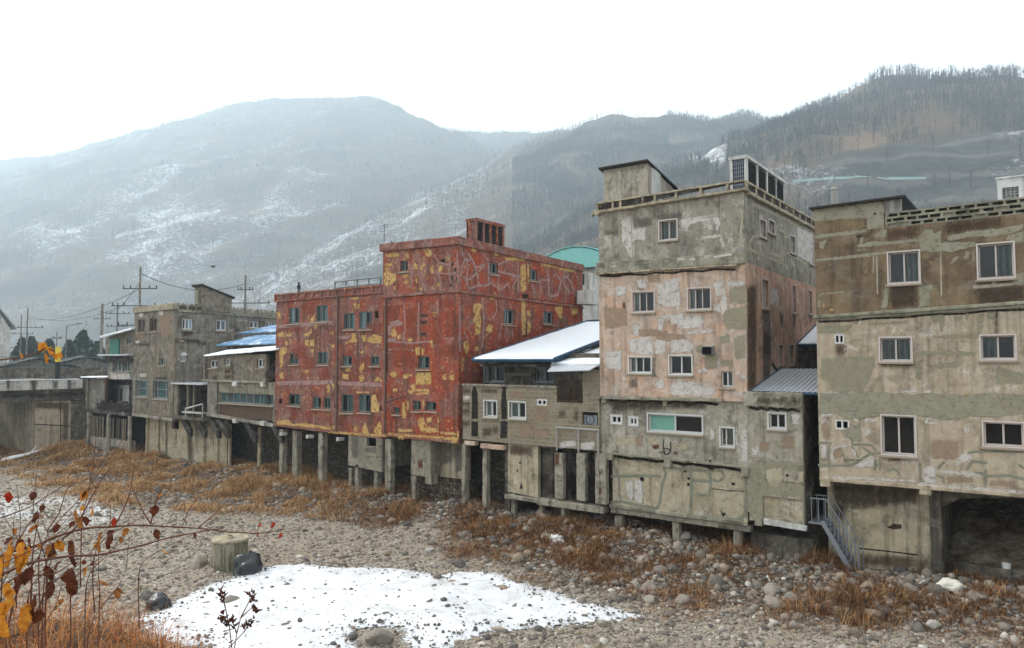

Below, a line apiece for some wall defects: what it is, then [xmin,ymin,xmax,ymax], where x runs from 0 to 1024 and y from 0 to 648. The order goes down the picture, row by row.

leakage [889,227,919,239]
leakage [947,219,1001,233]
peeling [276,297,494,444]
crack [387,250,576,352]
peeling [493,252,575,335]
peeling [604,275,748,407]
leakage [809,276,1024,323]
peeling [890,312,995,393]
peeling [559,440,595,450]
crack [610,441,1024,521]